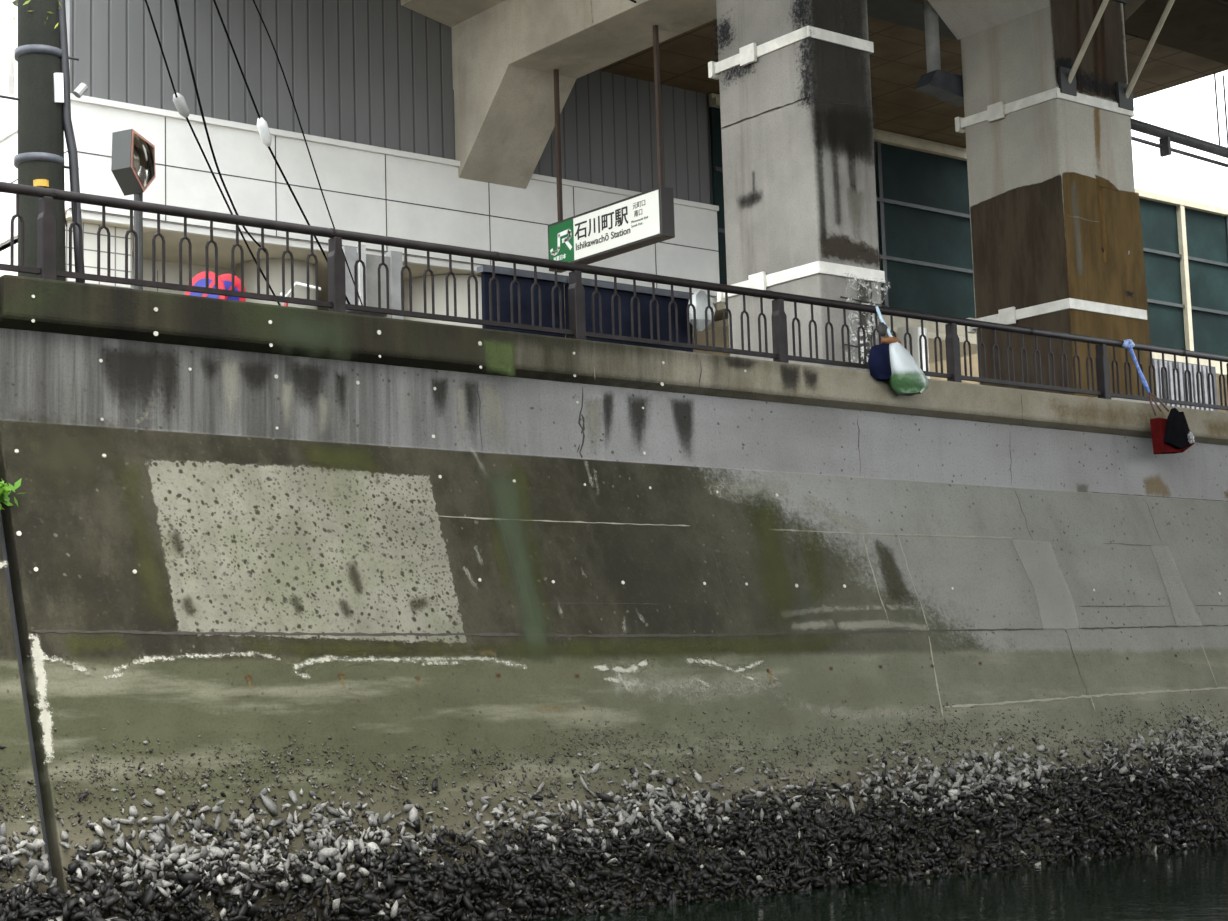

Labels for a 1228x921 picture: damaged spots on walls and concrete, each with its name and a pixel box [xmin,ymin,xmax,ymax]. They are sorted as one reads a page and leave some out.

leakage [796,33,815,106]
leakage [103,349,177,403]
leakage [205,361,268,409]
leakage [283,364,345,419]
leakage [433,380,503,428]
crack [577,387,585,458]
leakage [629,398,646,440]
leakage [673,401,692,444]
spalling [172,532,182,553]
crack [1092,492,1228,546]
spalling [350,565,362,592]
crack [31,605,1228,709]